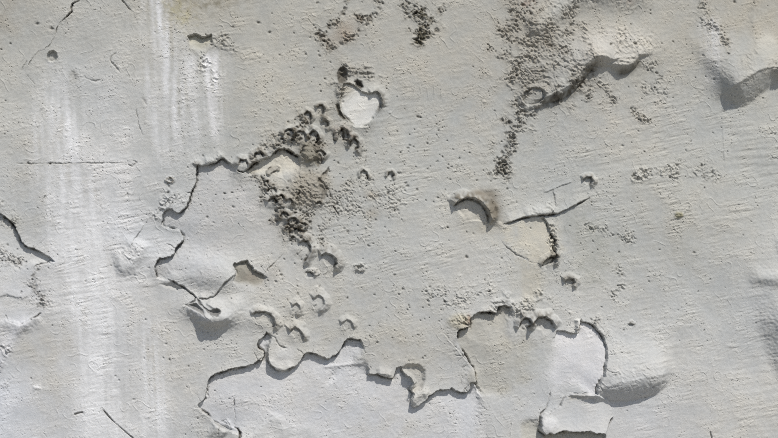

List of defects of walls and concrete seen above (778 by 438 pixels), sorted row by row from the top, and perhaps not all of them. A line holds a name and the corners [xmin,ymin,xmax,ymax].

crack [20,0,81,87]
spalling [328,64,393,135]
peeling [150,120,332,297]
peeling [195,286,614,438]
crack [232,396,242,438]